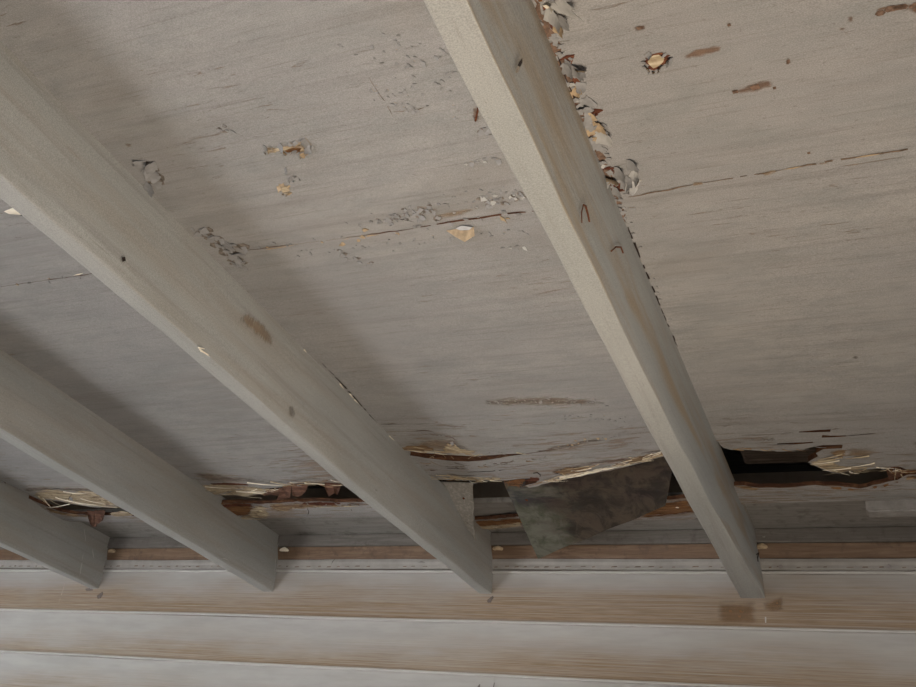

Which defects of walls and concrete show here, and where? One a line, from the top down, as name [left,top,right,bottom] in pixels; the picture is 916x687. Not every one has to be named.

rust [875,2,916,16]
peeling [262,138,314,159]
peeling [534,0,678,347]
crack [631,148,908,197]
peeling [191,186,533,272]